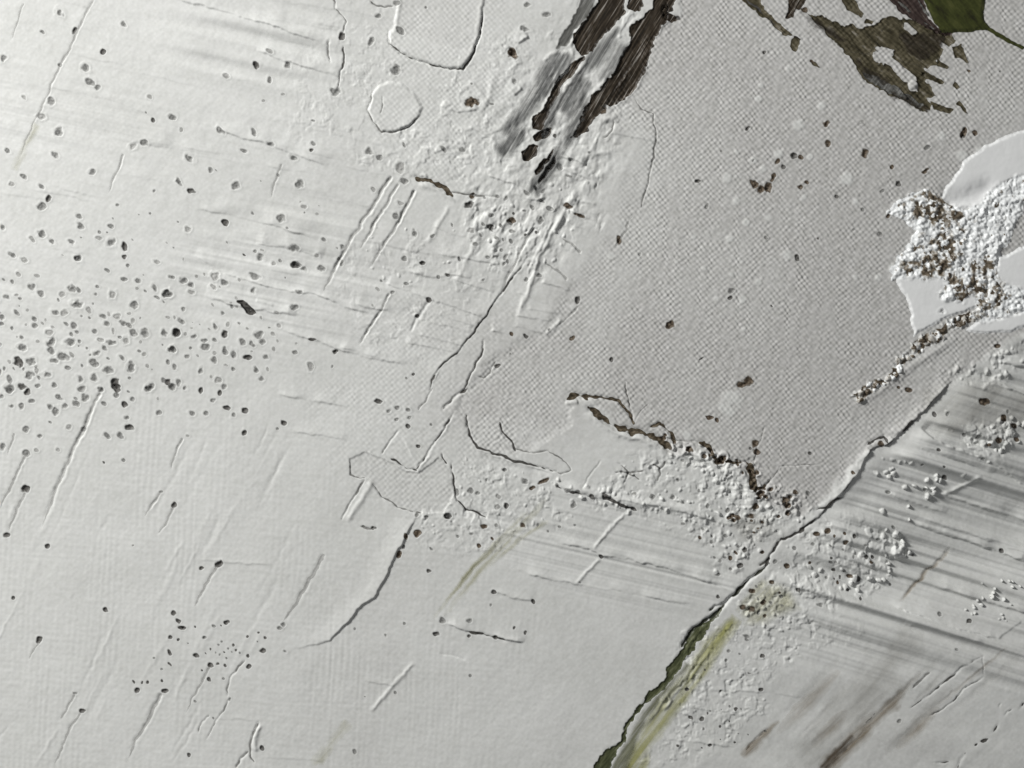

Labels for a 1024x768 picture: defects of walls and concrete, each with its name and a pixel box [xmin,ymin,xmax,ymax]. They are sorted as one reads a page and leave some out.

peeling [742,0,971,113]
peeling [465,0,680,265]
spalling [750,153,803,193]
spalling [851,127,1024,403]
crack [385,268,636,517]
spalling [737,376,754,388]
crack [868,402,932,454]
spalling [522,478,613,508]
crack [567,385,854,768]
crack [469,631,505,640]
crack [912,661,984,714]